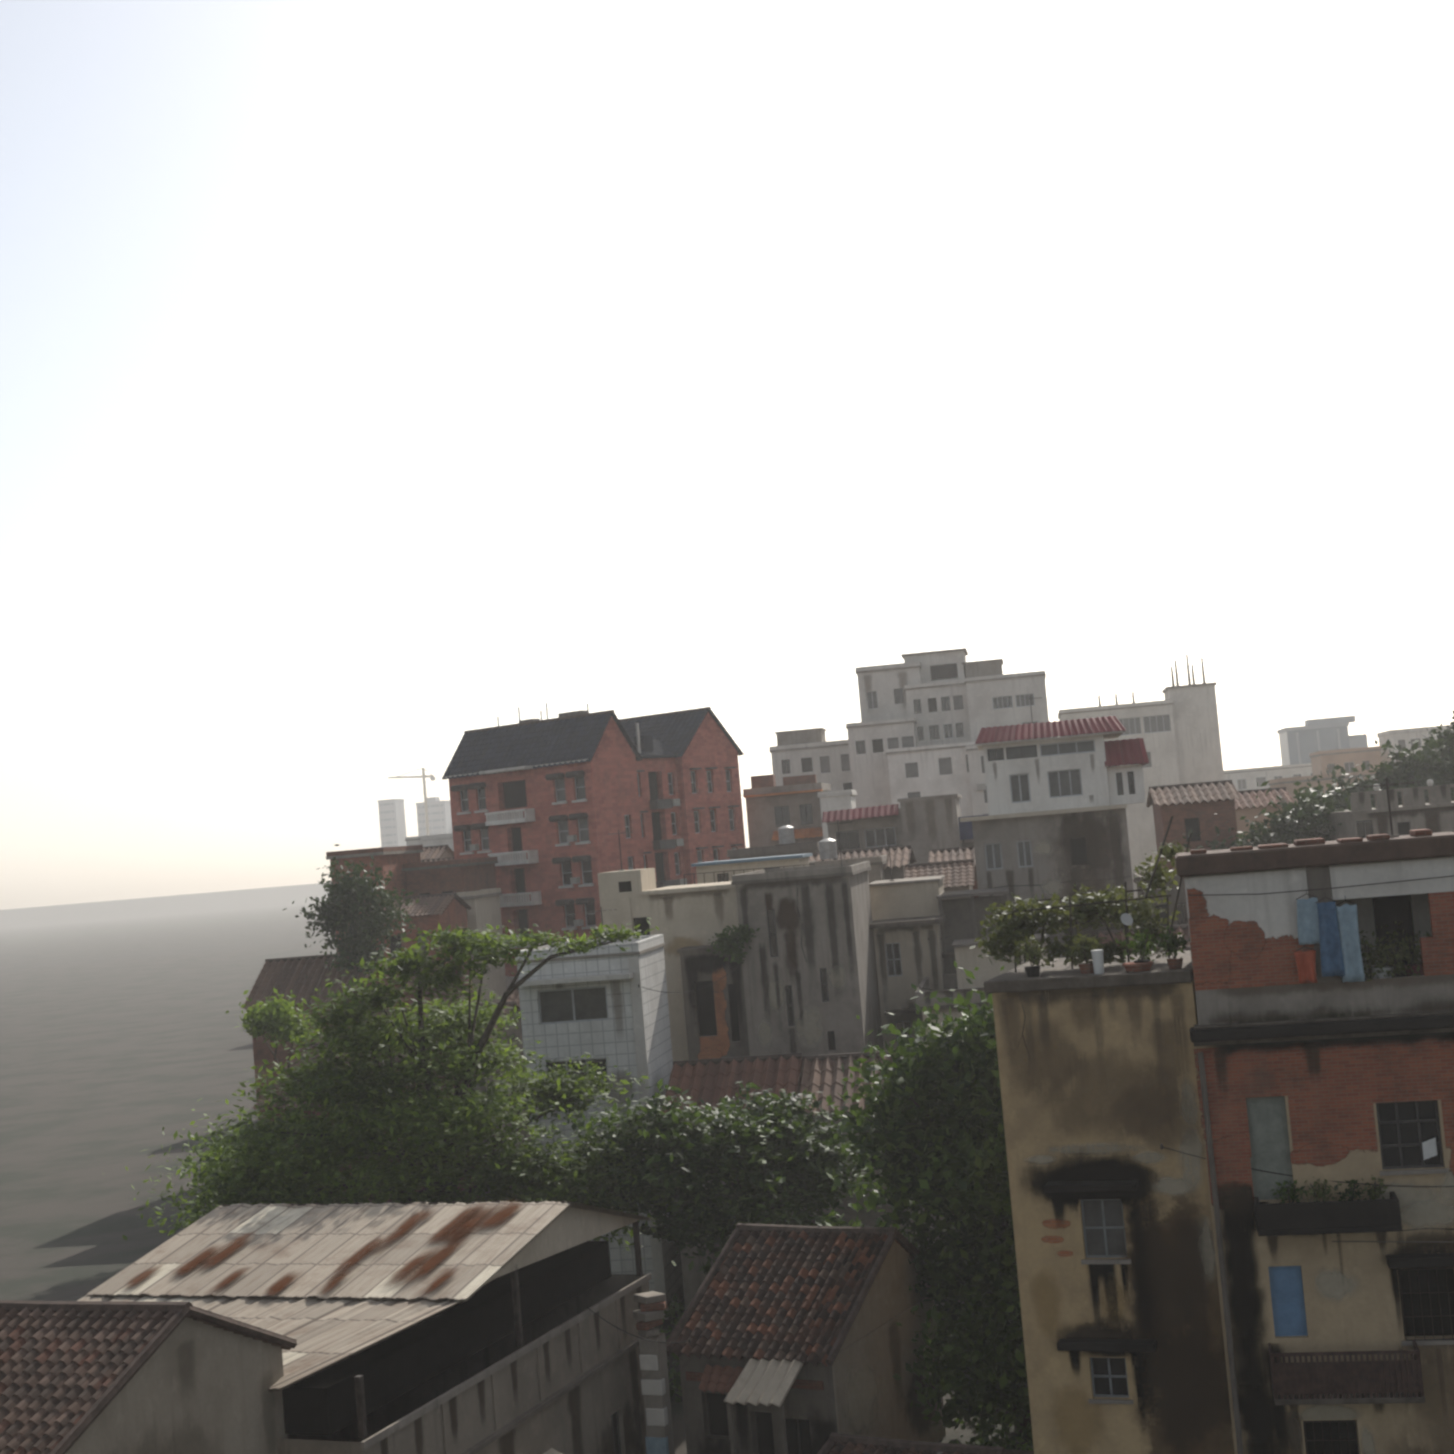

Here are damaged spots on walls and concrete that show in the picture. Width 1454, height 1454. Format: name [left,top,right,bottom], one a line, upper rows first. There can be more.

damp [740,876,852,1053]
flaking render [1187,888,1318,991]
flaking render [1194,1039,1454,1209]
corrosion [127,1233,251,1289]
corrosion [267,1274,296,1295]
corrosion [323,1203,520,1292]
damp [1033,1156,1302,1454]